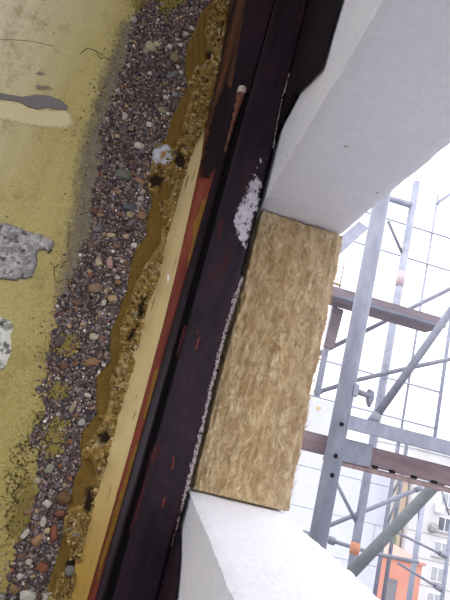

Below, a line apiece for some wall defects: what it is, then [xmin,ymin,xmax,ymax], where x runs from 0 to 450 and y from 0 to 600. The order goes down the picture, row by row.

flaking render [0,0,231,600]
corrosion [224,85,247,152]